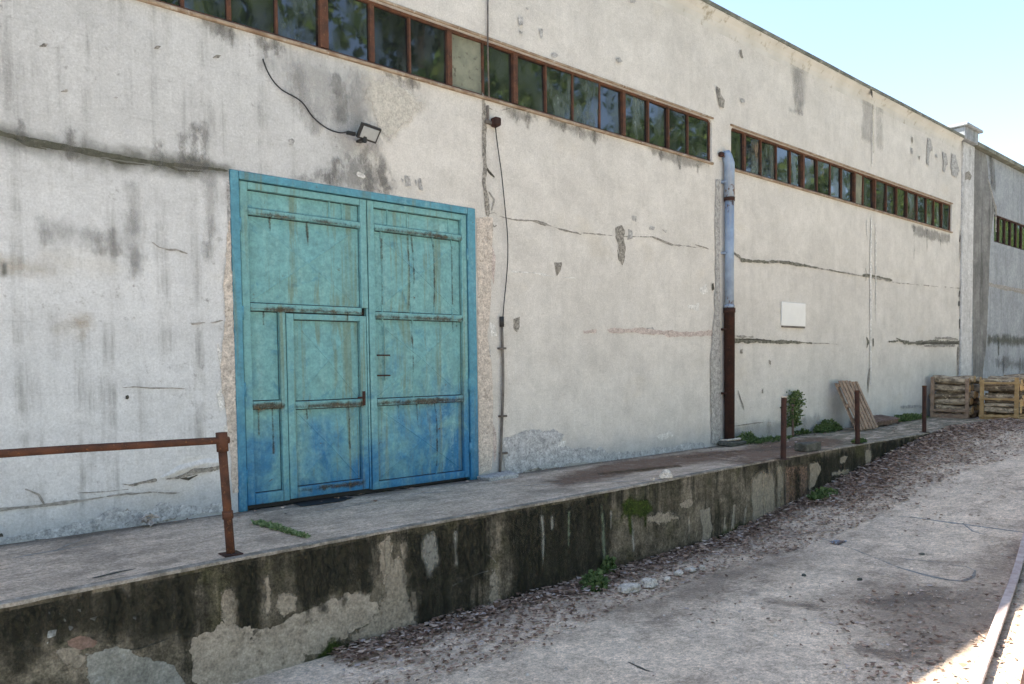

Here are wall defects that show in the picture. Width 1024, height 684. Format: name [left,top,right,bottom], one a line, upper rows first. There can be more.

damp [0,131,226,173]
crack [482,93,961,392]
peeling [911,137,994,393]
peeling [476,179,722,475]
crack [0,465,219,512]
peeling [47,534,418,684]
damp [295,540,391,611]
damp [403,519,493,626]
damp [511,497,612,601]